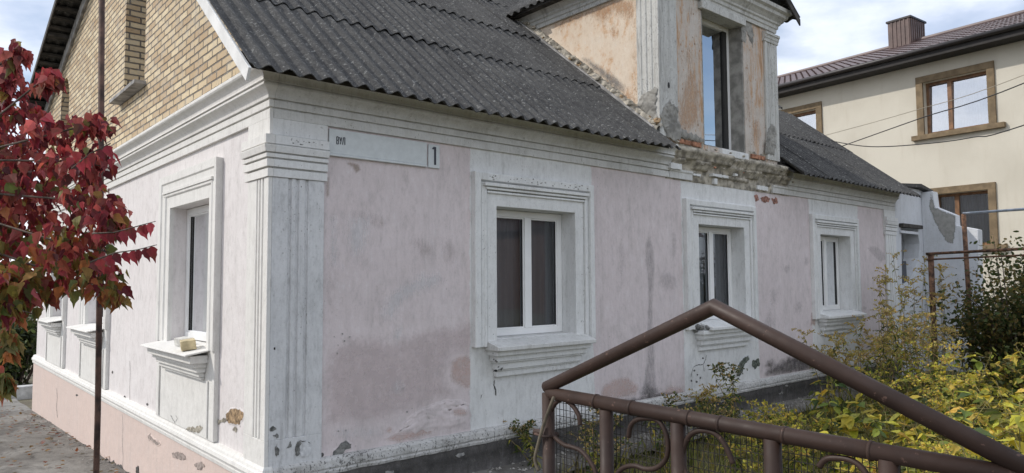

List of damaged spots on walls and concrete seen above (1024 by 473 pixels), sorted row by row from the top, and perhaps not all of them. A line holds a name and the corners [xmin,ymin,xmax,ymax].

spalling [665,37,794,204]
peeling [736,355,760,378]
leakage [769,360,812,374]
spalling [218,407,244,432]
peeling [270,426,352,457]